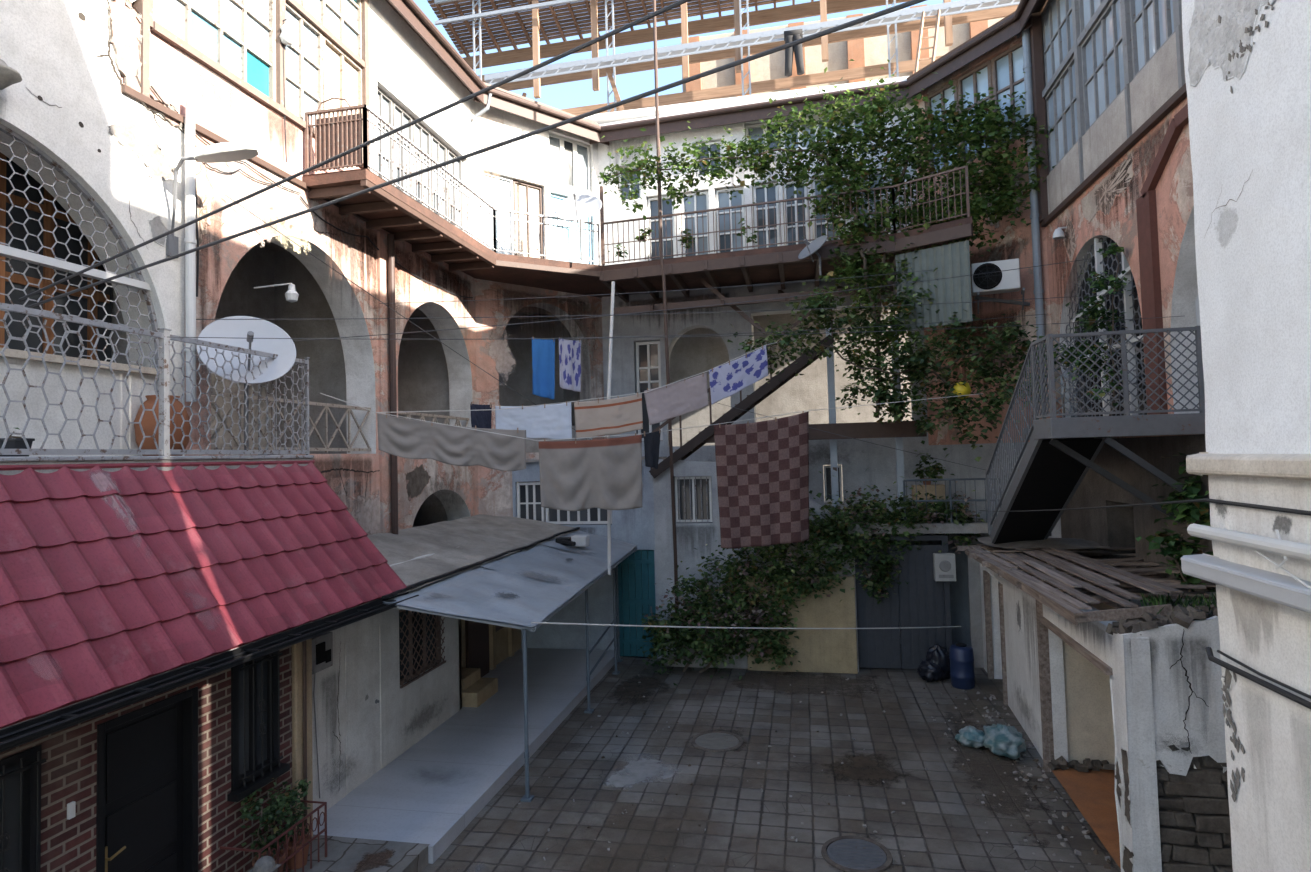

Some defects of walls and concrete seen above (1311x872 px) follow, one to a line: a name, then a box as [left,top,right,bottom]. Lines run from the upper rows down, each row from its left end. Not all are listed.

spalling [107,0,197,181]
spalling [1188,0,1275,94]
crack [1204,170,1253,238]
crack [1170,629,1209,754]
damp [825,754,909,787]
spalling [1115,668,1245,872]